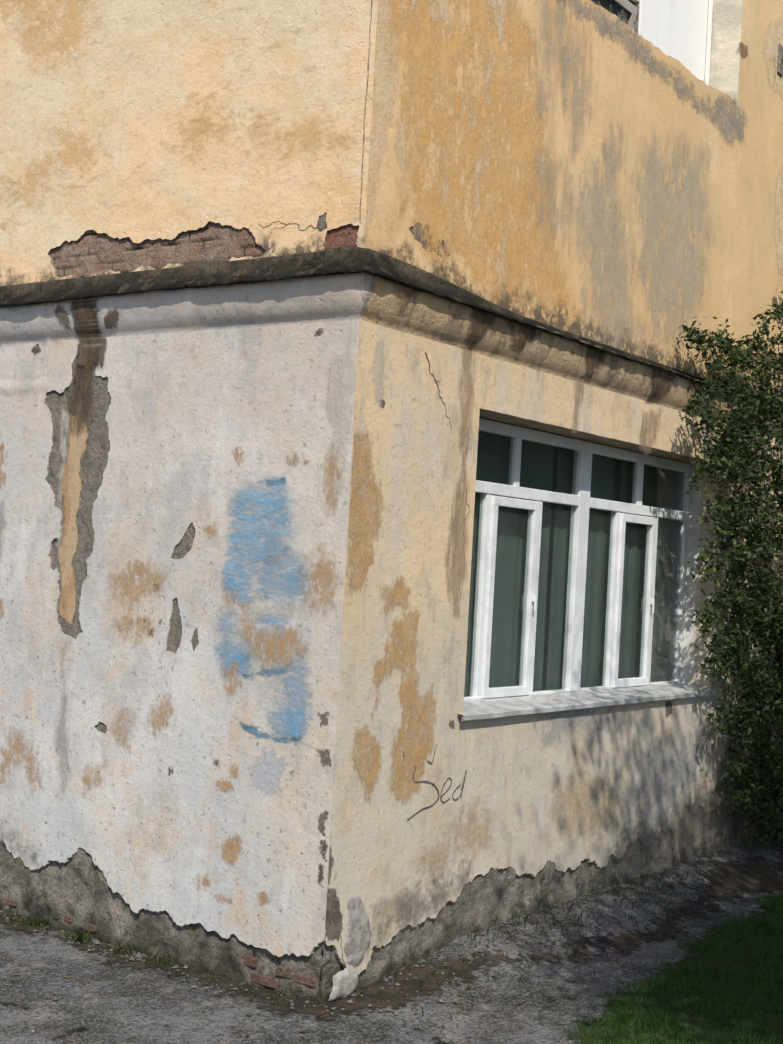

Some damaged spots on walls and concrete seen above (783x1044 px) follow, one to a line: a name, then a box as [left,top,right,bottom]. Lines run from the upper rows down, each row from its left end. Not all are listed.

flaking render [48,221,266,278]
crack [258,221,316,231]
leakage [572,141,633,425]
leakage [638,146,707,334]
flaking render [44,300,119,639]
peeling [113,563,199,654]
flaking render [171,522,215,559]
peeling [348,434,383,590]
crack [425,352,452,428]
leakage [640,369,675,451]
peeling [354,575,436,804]
flaking render [0,789,783,1004]